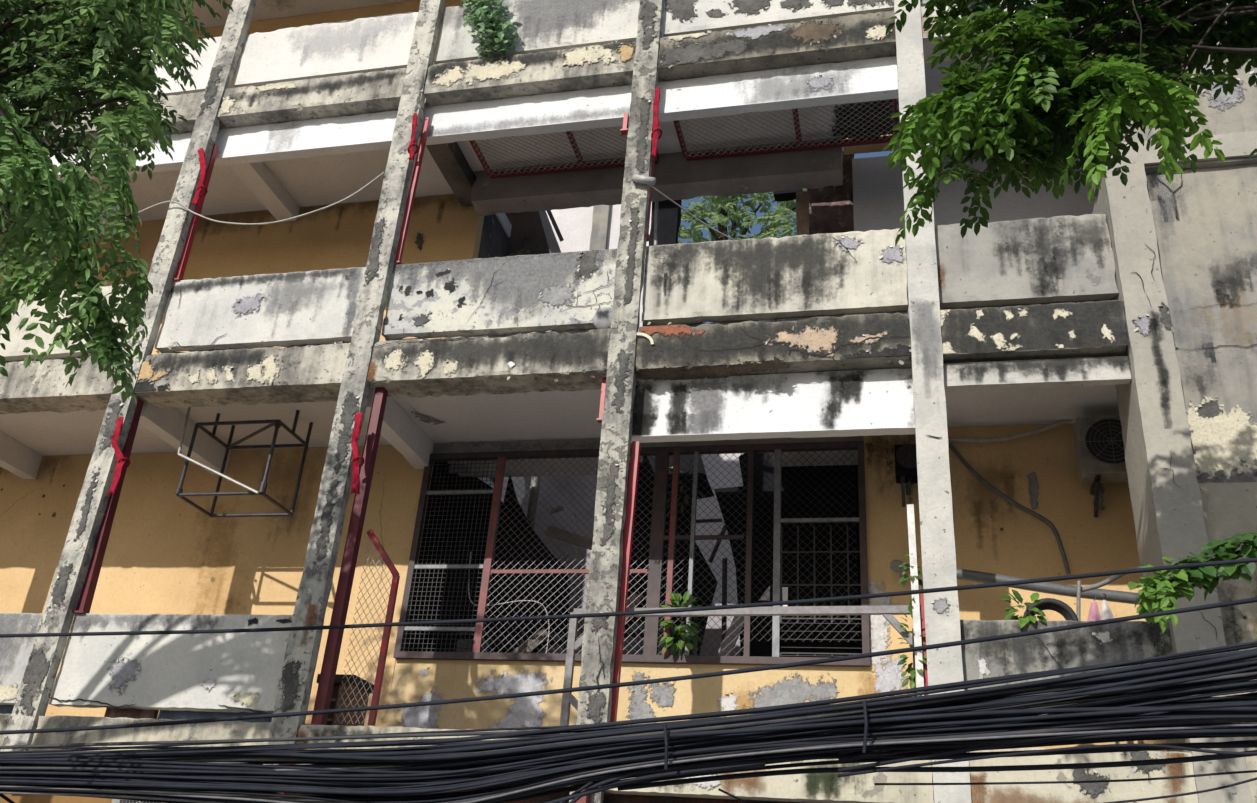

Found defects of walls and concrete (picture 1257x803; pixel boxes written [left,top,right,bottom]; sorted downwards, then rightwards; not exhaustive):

damp [637,233,911,366]
peeling [966,307,1028,351]
damp [941,223,1130,381]
spalling [554,325,912,414]
damp [632,379,757,436]
damp [819,370,865,429]
peeling [1186,395,1257,481]
damp [0,613,39,668]
peeling [473,668,553,731]
peeling [716,671,844,711]
rust [970,773,1052,803]
rust [1169,752,1180,791]